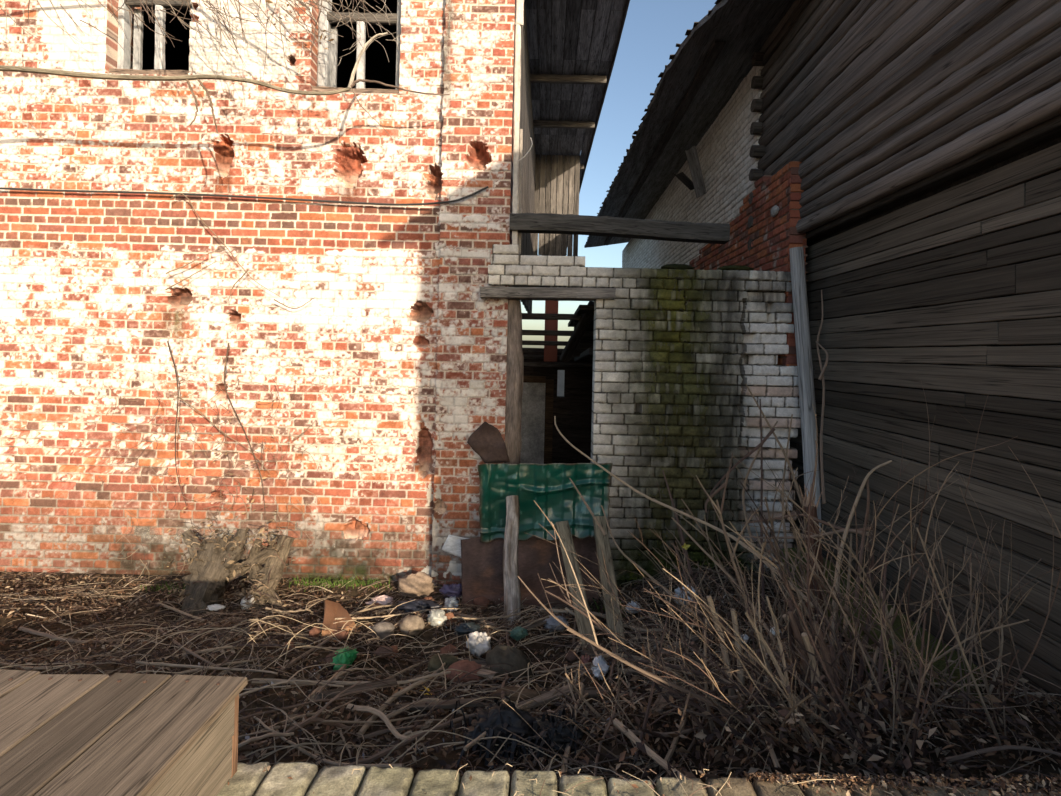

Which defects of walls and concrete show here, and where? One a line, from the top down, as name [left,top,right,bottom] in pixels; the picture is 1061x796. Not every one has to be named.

peeling [0,0,514,585]
leakage [628,275,743,575]